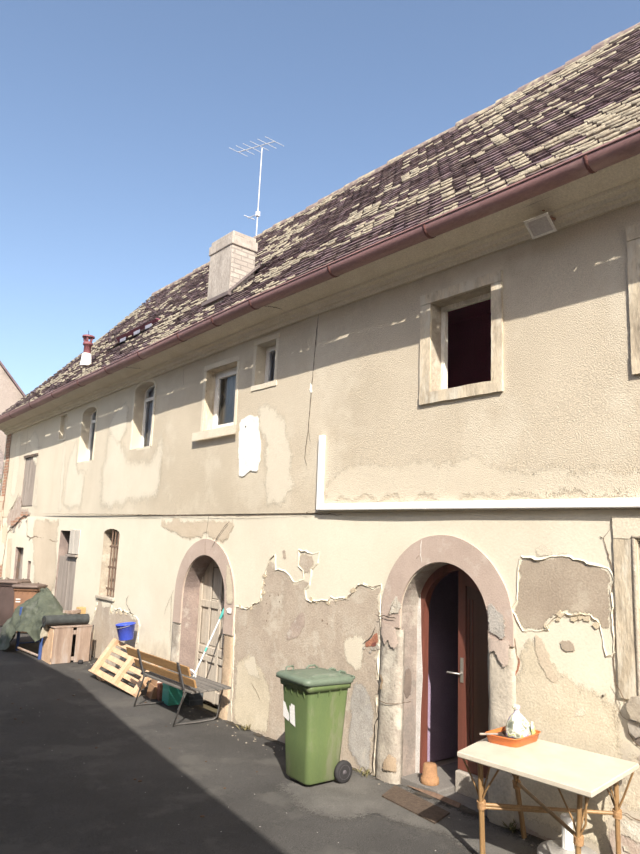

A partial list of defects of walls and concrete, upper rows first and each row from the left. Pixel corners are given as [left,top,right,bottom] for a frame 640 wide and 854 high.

crack [305,323,318,465]
peeling [226,549,402,776]
peeling [487,545,617,683]
crack [600,522,626,719]
spalling [627,721,640,764]
peeling [607,829,640,854]